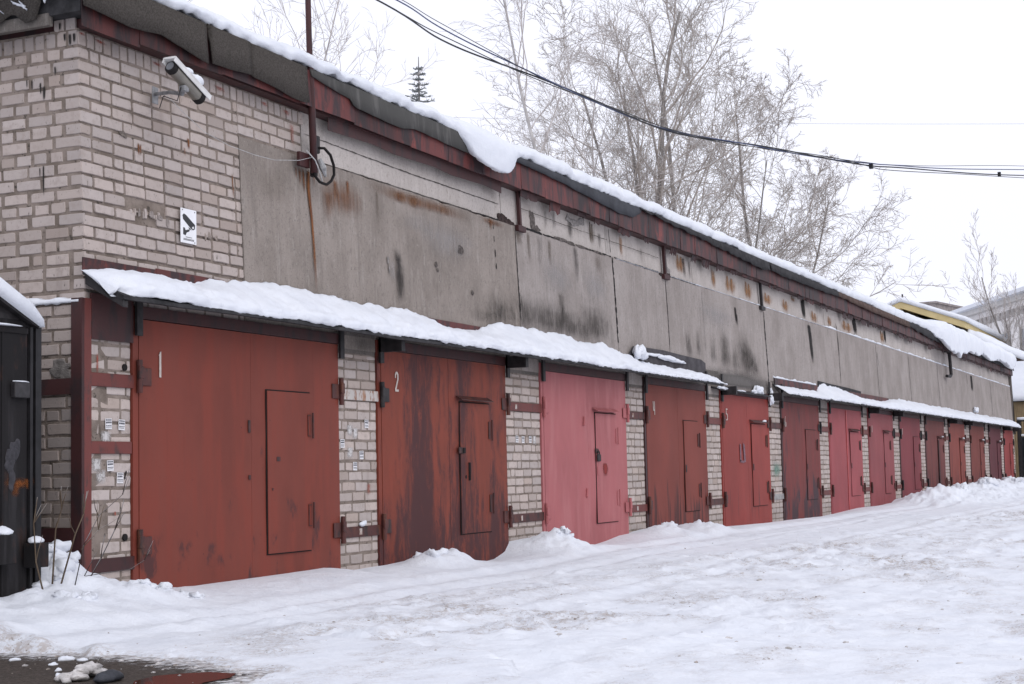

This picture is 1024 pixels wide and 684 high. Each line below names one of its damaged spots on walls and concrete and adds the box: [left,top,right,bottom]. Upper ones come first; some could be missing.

rust [296,169,316,270]